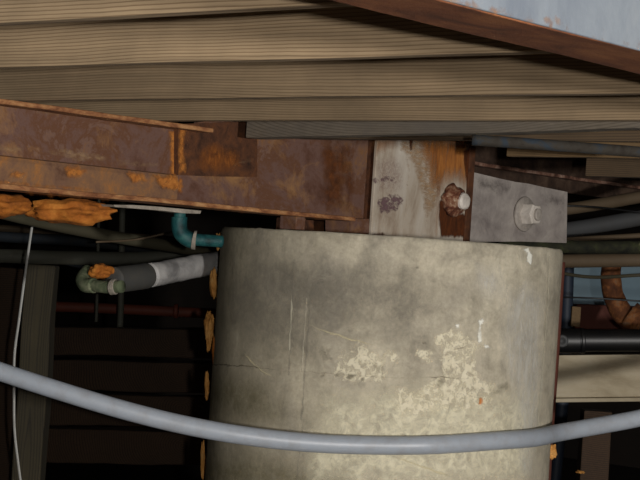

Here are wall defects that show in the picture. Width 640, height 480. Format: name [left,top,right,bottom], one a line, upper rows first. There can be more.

corrosion [157,130,186,192]
corrosion [402,140,469,237]